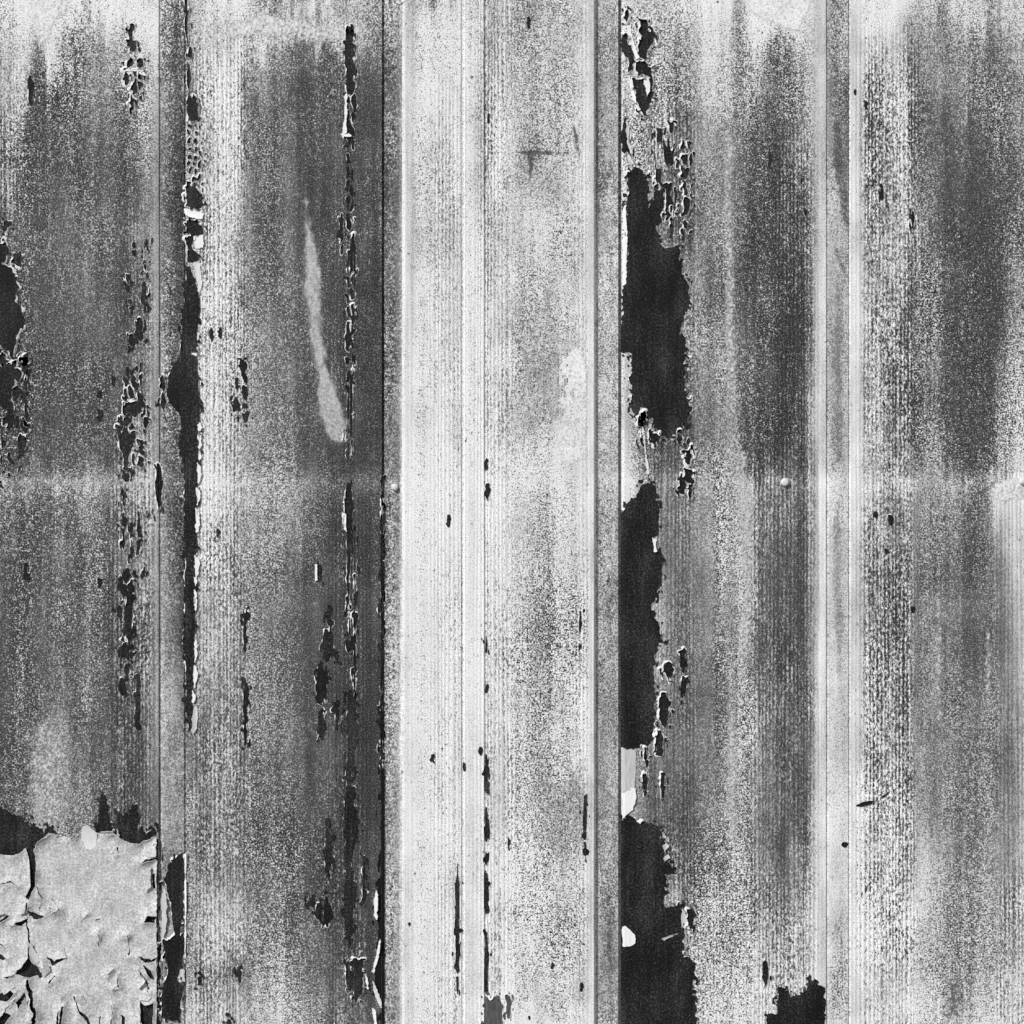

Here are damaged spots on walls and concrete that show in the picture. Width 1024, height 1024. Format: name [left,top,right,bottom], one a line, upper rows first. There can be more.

peeling [621,6,662,122]
leakage [748,0,810,30]
peeling [181,117,210,291]
leakage [304,222,348,442]
leakage [724,137,736,415]
peeling [96,237,155,679]
peeling [621,117,699,1024]
leakage [735,451,755,655]
leakage [726,722,737,859]
peeling [0,792,159,1024]
peeling [764,975,826,1024]
leakage [944,979,964,1018]